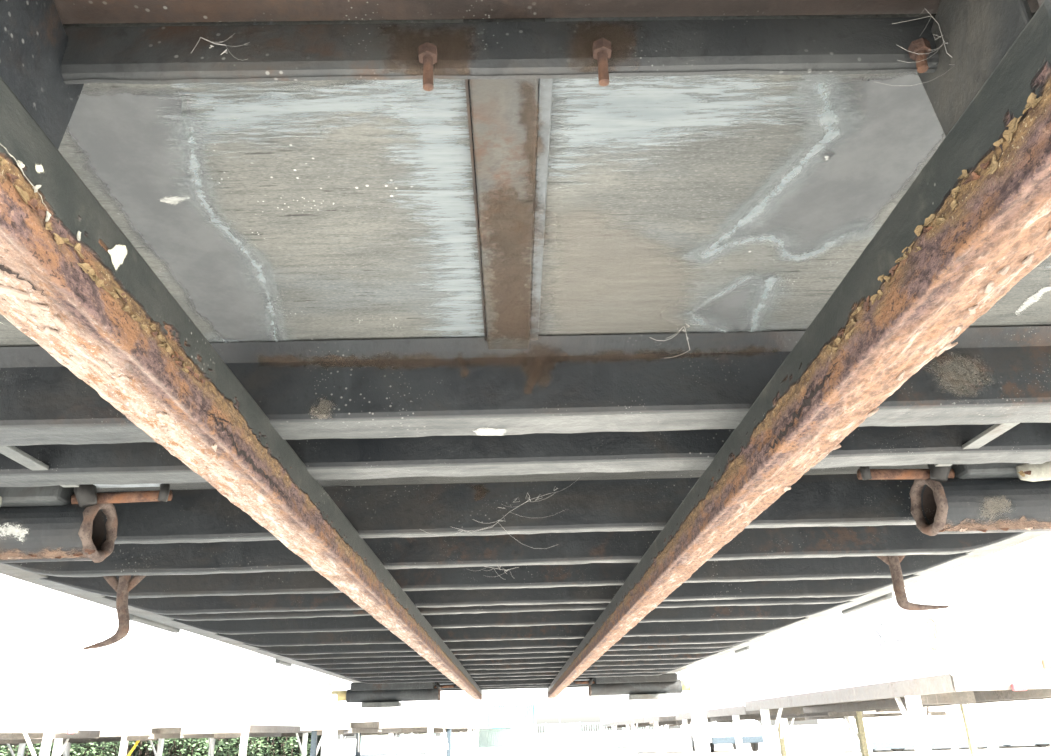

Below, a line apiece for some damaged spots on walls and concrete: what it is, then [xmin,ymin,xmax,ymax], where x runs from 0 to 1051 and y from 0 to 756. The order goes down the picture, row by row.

damp [66,79,487,343]
rust [259,83,544,377]
rust [544,346,777,363]
damp [545,73,945,336]
rust [0,547,96,560]
rust [939,516,1051,532]